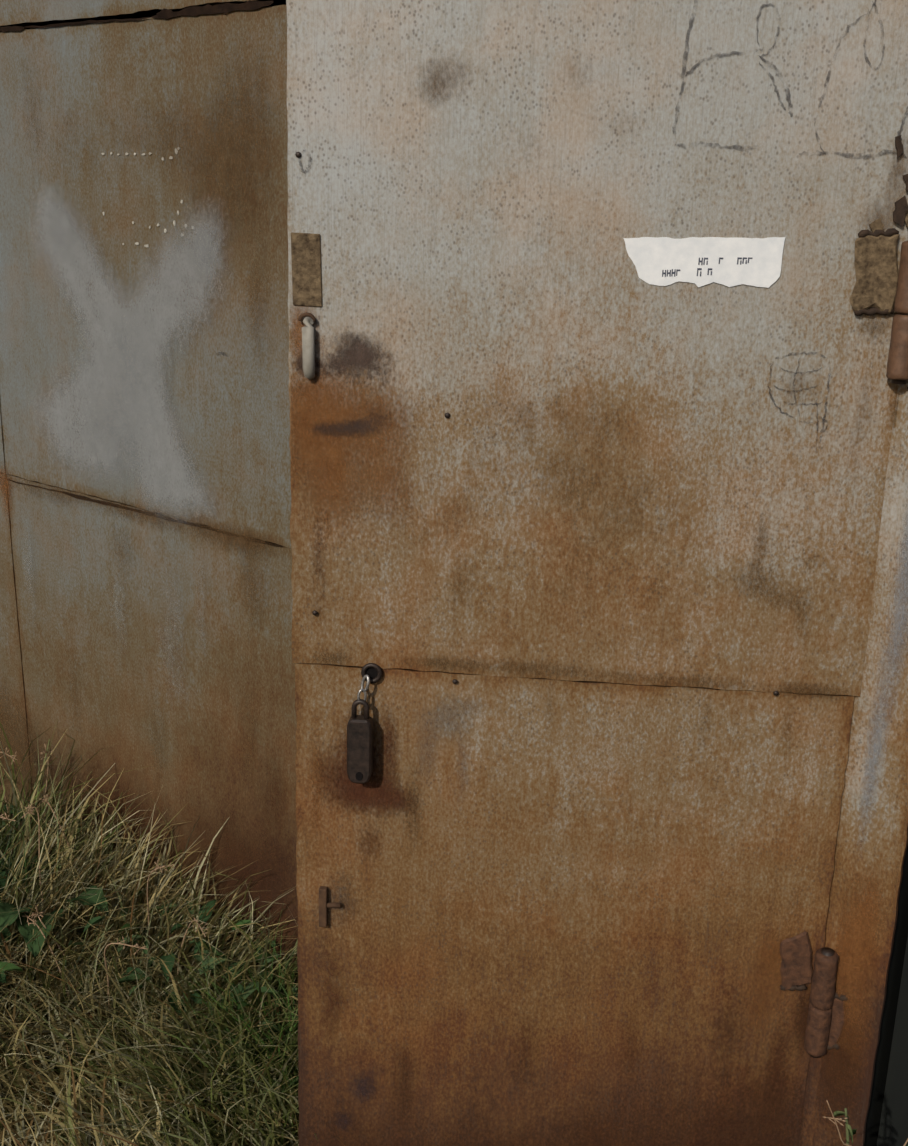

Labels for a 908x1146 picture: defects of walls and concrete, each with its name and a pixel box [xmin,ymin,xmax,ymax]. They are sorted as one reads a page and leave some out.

rust [291,312,402,520]
rust [321,730,414,811]